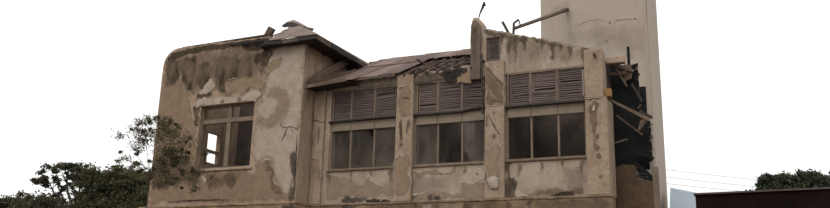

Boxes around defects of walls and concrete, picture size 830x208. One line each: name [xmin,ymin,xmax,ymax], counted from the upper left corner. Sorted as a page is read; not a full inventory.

water stain [165,37,274,92]
water stain [484,29,589,59]
peeling [149,44,305,204]
water stain [282,151,295,208]
crack [282,120,325,188]
peeling [325,143,542,208]